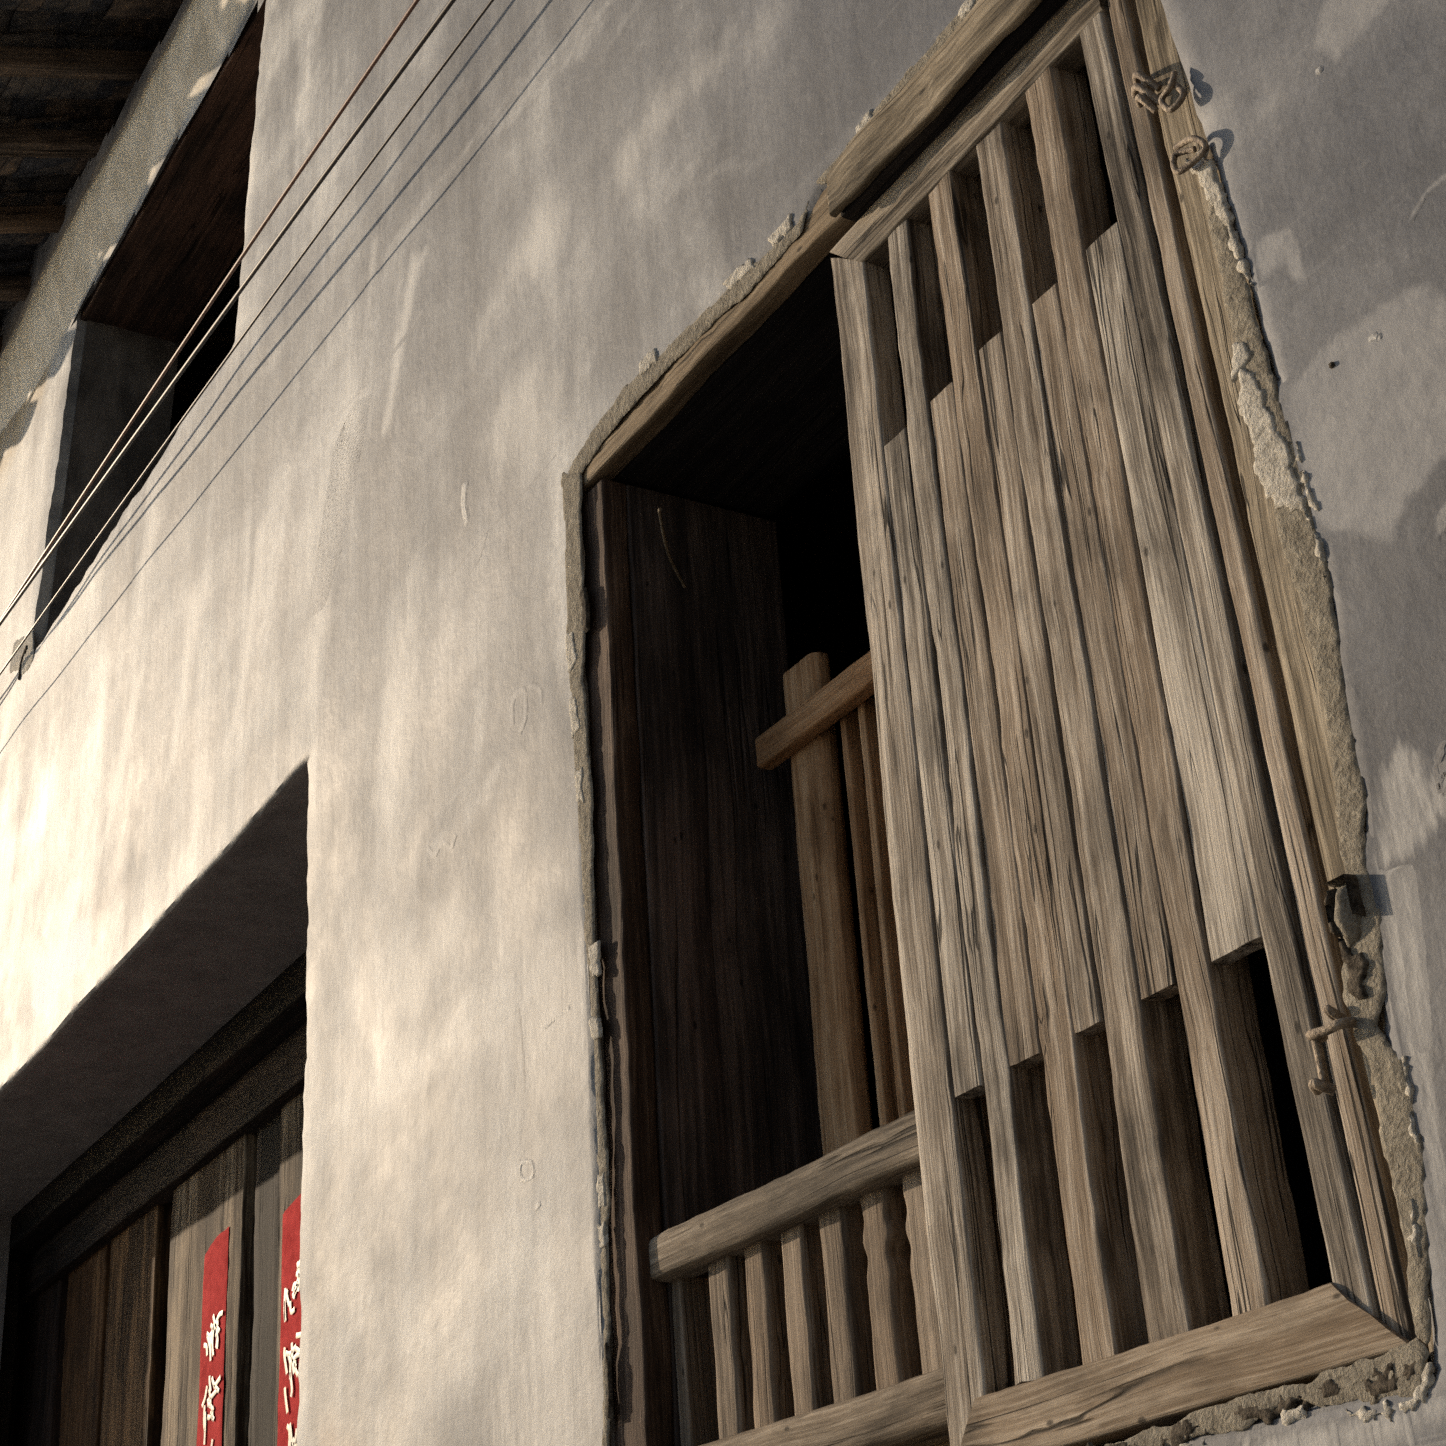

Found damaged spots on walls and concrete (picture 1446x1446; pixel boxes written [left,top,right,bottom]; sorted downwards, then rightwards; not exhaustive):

spalling [1086,146,1446,1446]